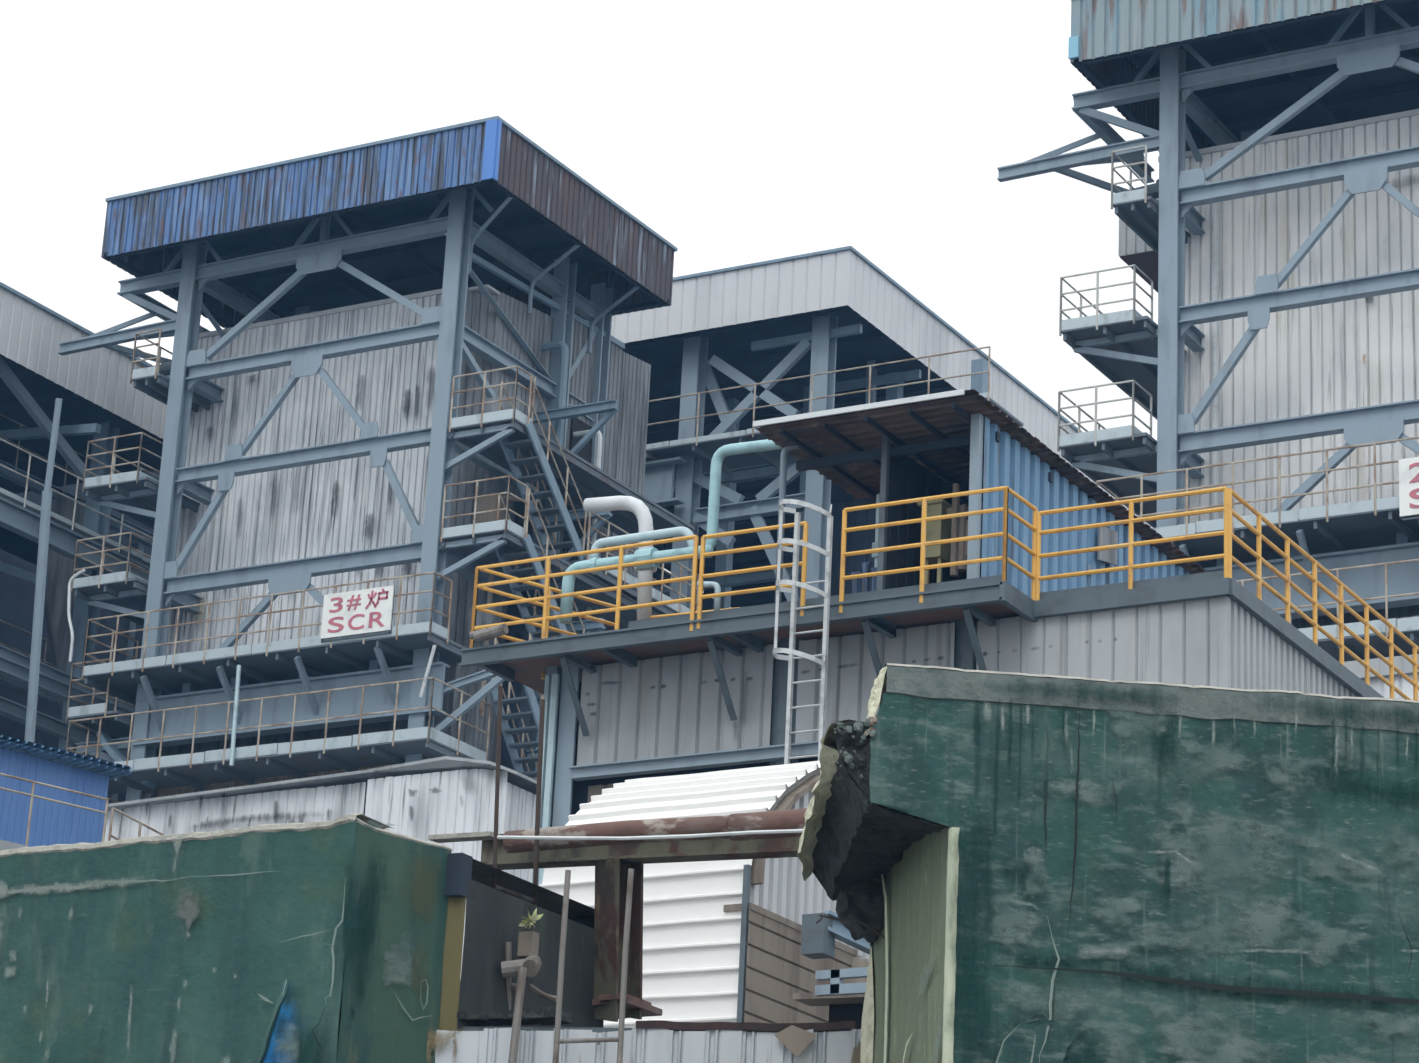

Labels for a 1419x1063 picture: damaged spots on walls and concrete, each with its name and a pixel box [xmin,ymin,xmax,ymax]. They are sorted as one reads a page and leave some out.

leakage [403,386,419,417]
leakage [194,786,306,832]
spalling [812,666,887,900]
leakage [1296,701,1419,805]
crack [0,871,272,897]
leakage [956,683,1181,1063]